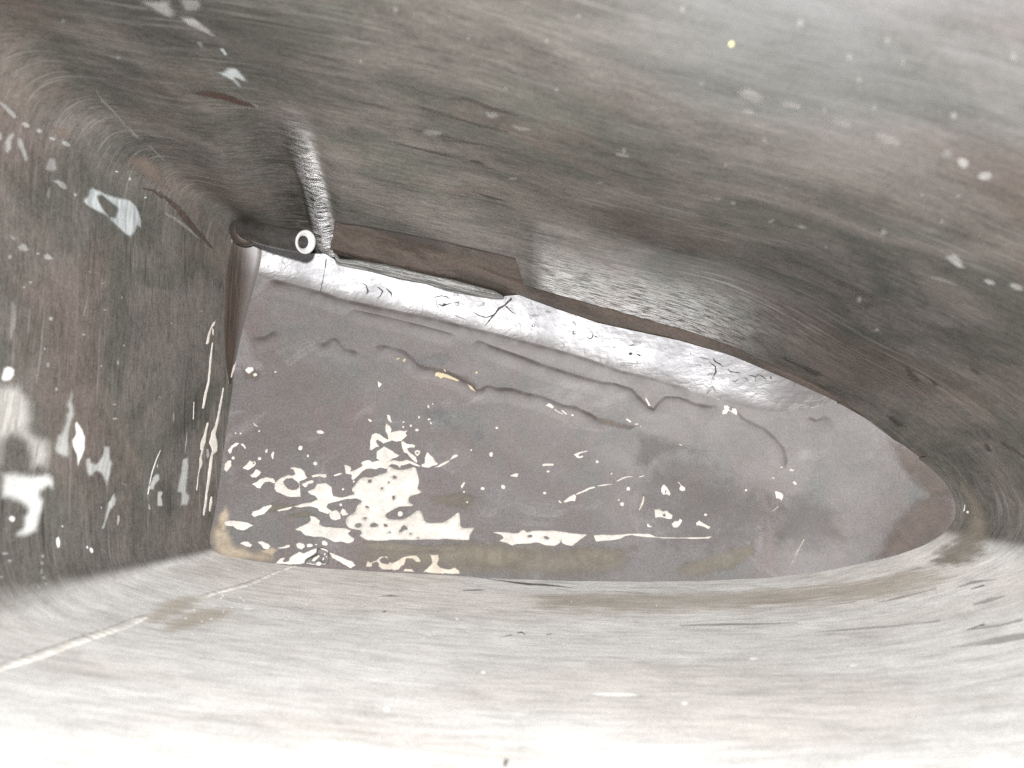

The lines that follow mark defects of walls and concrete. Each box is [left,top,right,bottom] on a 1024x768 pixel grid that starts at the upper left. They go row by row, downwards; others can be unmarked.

corrosion [198,92,254,106]
peeling [47,159,146,236]
crack [435,295,535,327]
peeling [193,320,216,419]
crack [700,357,772,382]
peeling [0,367,111,535]
peeling [149,464,162,506]
peeling [177,388,474,574]
peeling [101,495,120,528]
corrosion [213,509,276,561]
peeling [493,509,711,546]